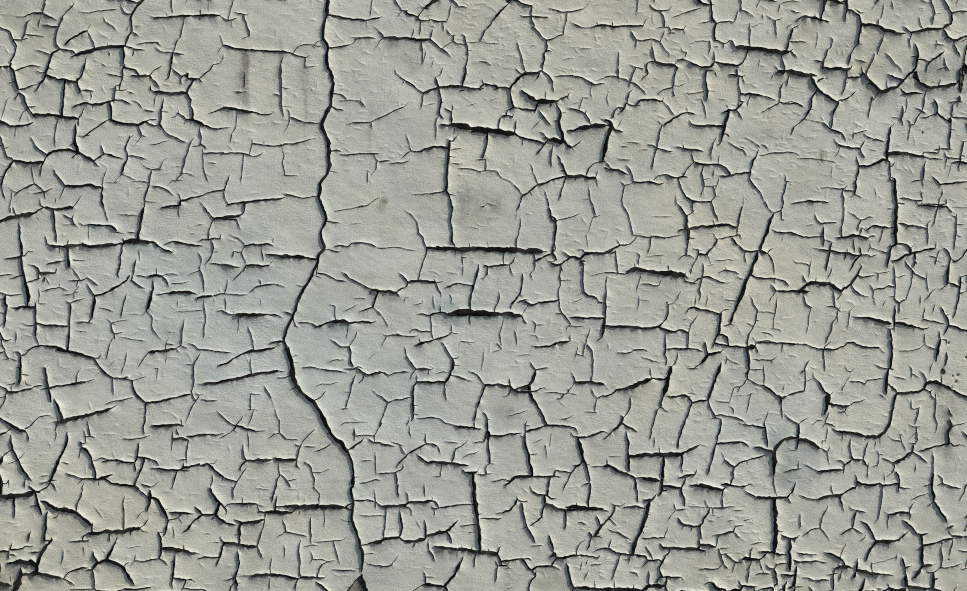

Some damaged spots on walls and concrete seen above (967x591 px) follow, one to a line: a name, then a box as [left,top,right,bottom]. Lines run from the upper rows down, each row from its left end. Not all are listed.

crack [0,0,603,591]
spalling [349,574,368,591]